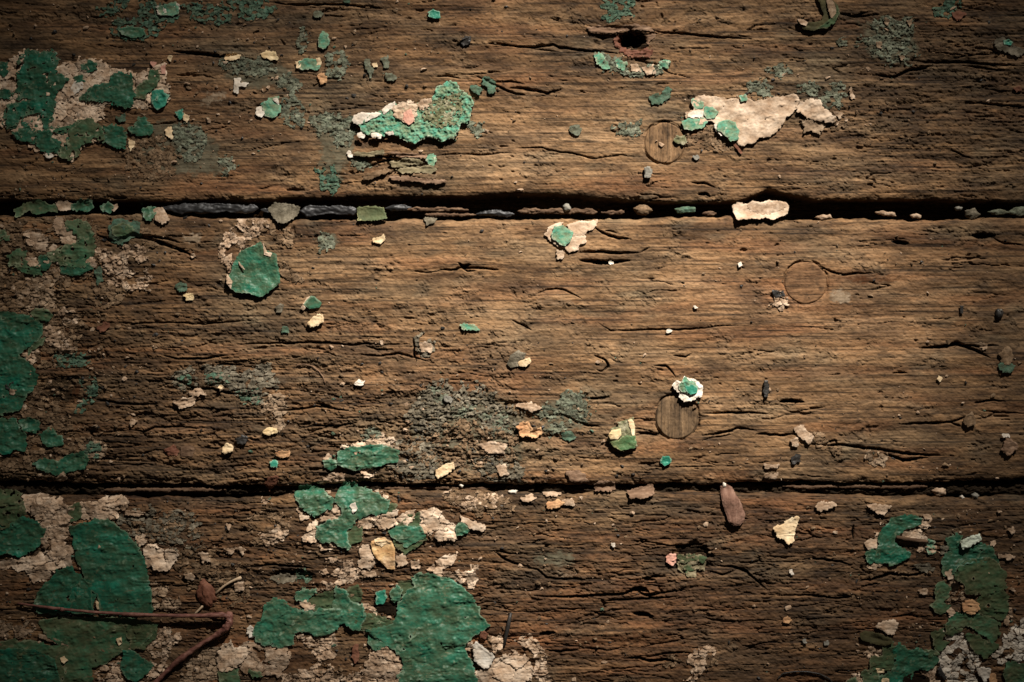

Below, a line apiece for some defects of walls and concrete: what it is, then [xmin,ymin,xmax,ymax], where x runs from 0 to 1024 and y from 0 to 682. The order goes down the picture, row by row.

peeling [0,48,190,162]
peeling [673,77,848,160]
peeling [544,219,598,259]
peeling [0,198,576,682]
peeling [566,470,654,499]
peeling [815,501,837,512]
peeling [846,503,1024,682]